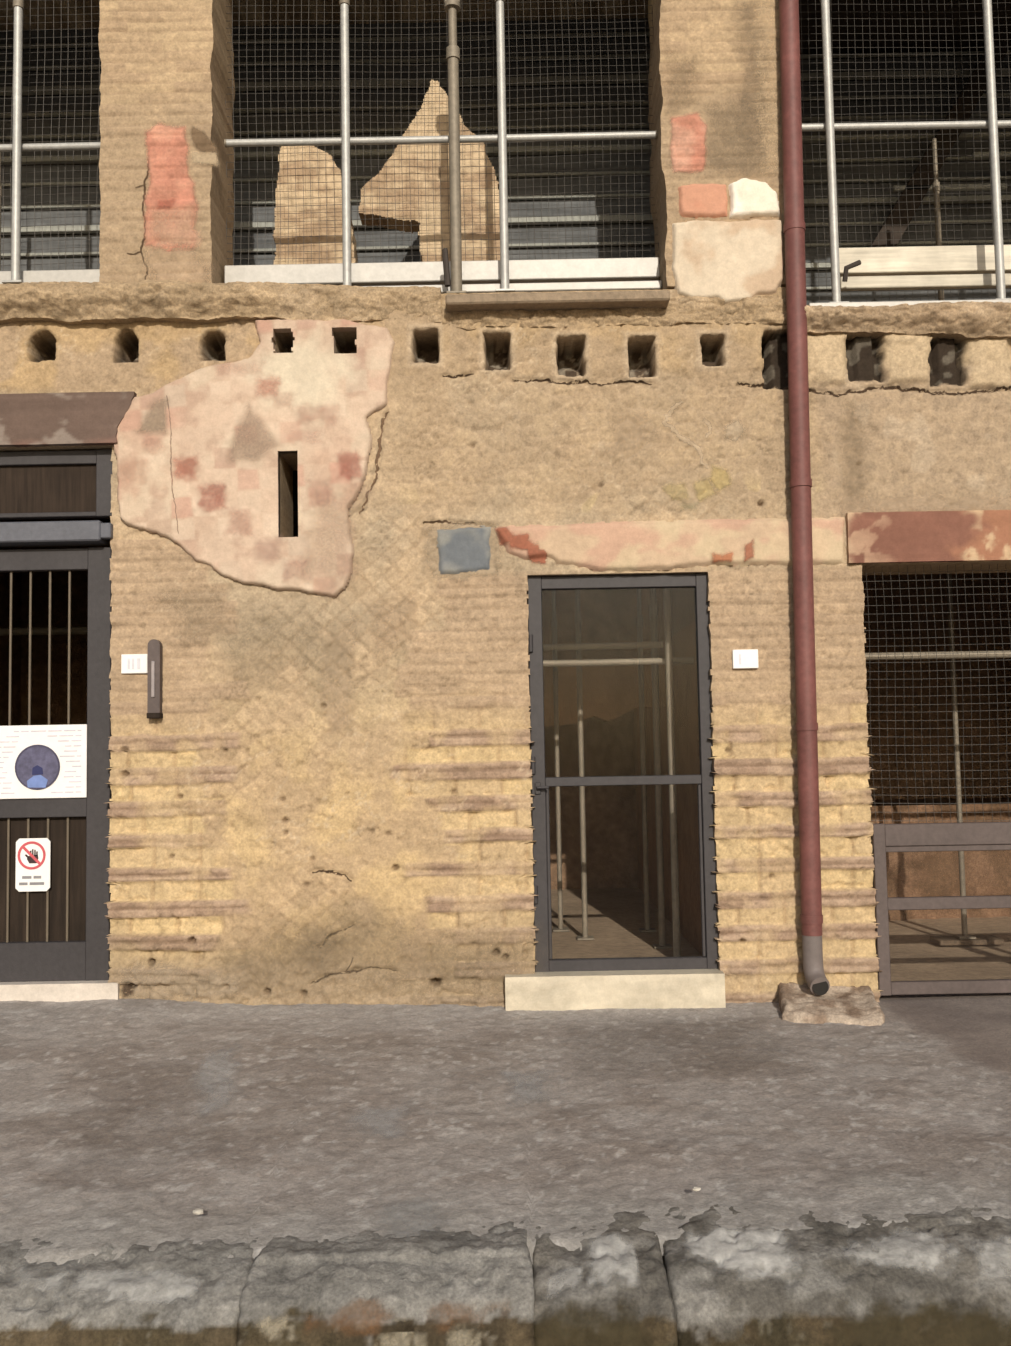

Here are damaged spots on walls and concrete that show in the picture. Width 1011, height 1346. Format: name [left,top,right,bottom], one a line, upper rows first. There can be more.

crack [127,159,149,280]
crack [512,378,652,386]
crack [738,382,1011,397]
flaking render [114,319,395,597]
peeling [496,527,547,564]
peeling [713,540,754,562]